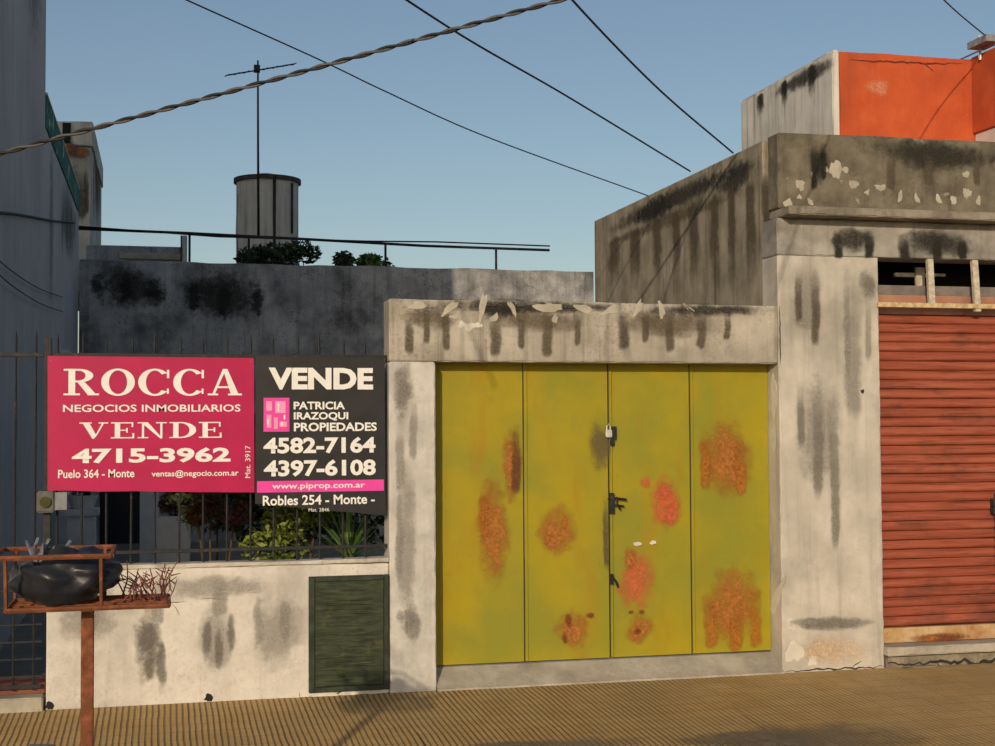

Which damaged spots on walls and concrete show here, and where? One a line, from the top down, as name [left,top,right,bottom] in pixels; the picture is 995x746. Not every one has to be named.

peeling [826,160,886,195]
peeling [936,171,981,206]
water stain [609,161,769,270]
water stain [405,308,450,352]
flaking render [440,294,499,332]
water stain [458,300,605,355]
flaking render [532,303,620,323]
water stain [637,305,749,351]
rust [504,441,521,492]
rust [700,426,747,493]
rust [625,550,651,643]
rust [704,573,761,650]